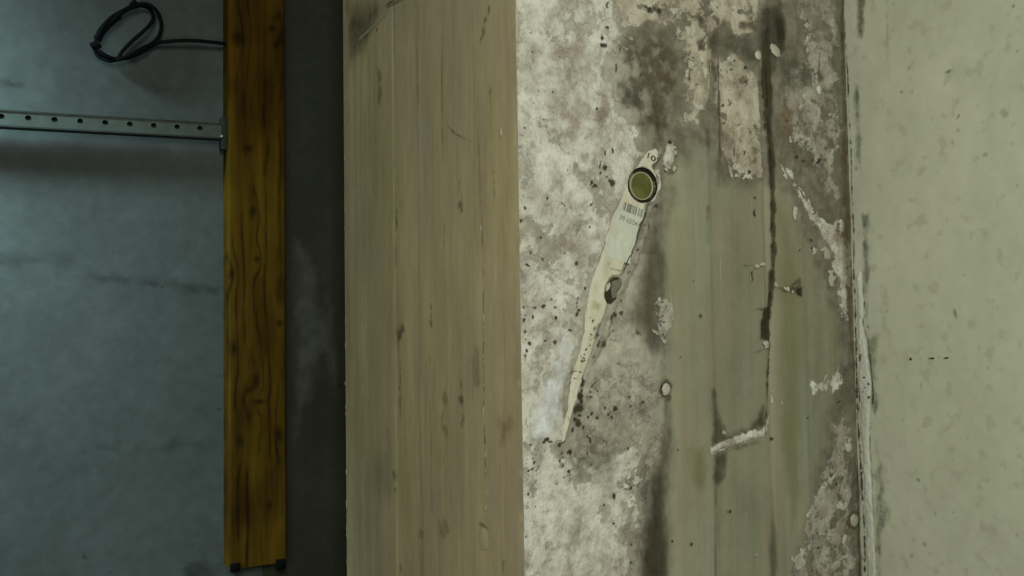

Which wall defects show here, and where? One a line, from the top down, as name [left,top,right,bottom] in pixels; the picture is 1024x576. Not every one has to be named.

damp [516,0,852,576]
spalling [776,278,802,296]